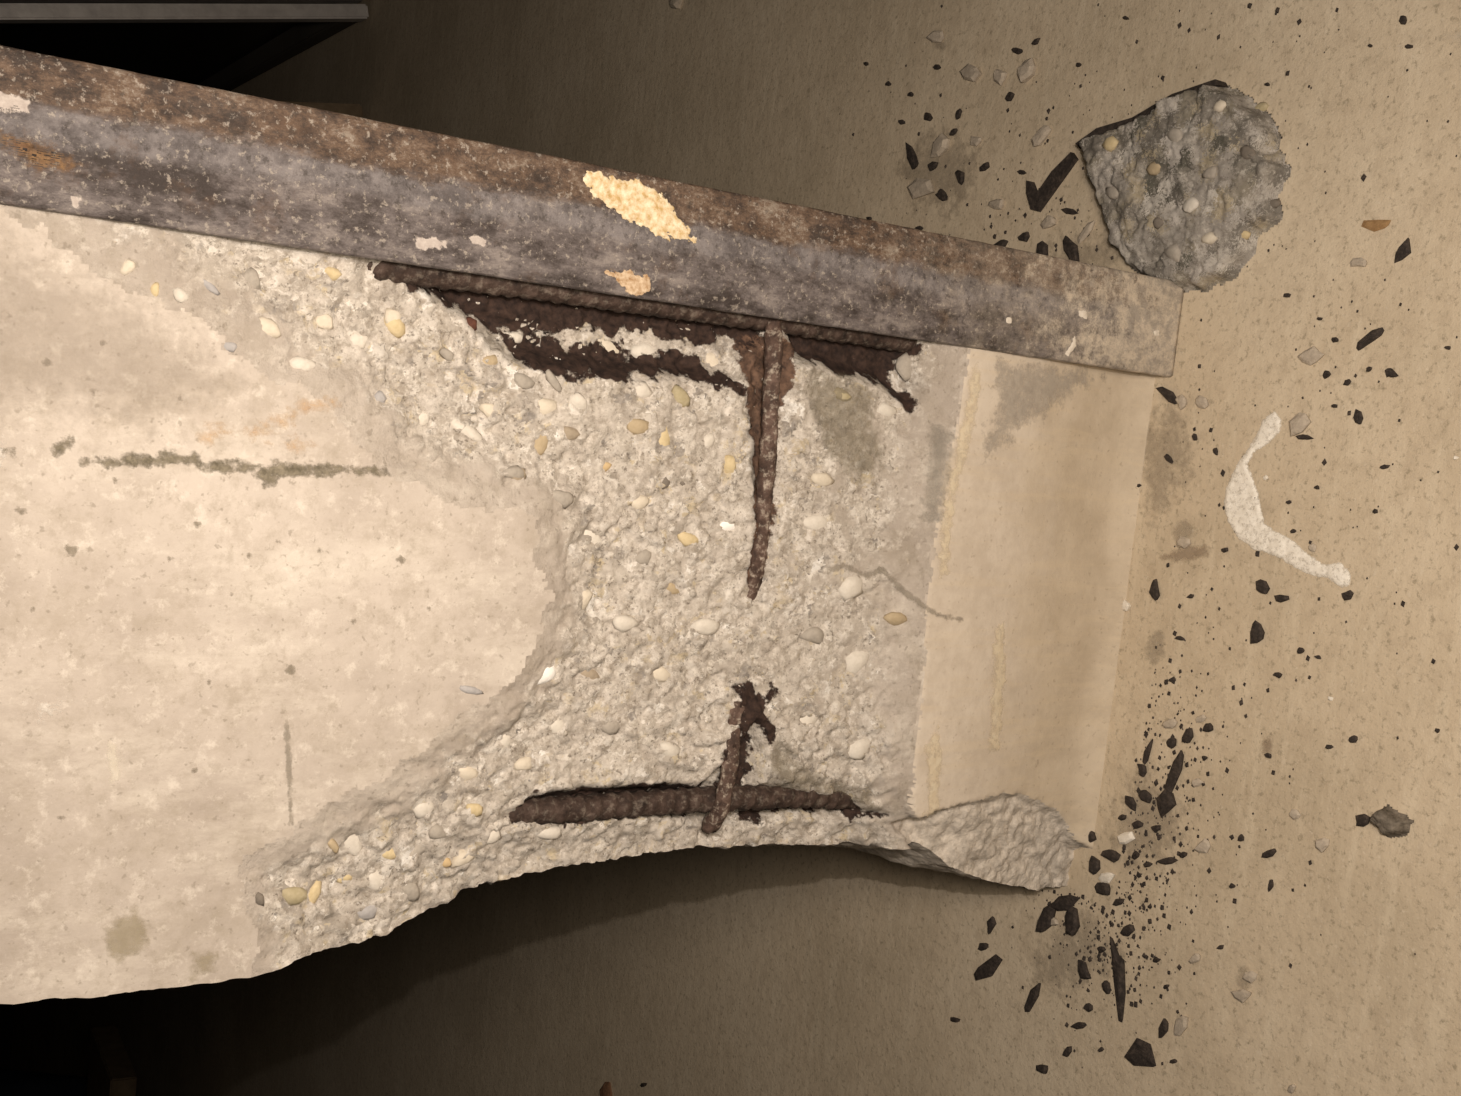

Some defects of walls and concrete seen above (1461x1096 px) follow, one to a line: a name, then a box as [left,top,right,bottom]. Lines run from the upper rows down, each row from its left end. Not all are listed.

crack [54,438,390,487]
rust [406,284,922,583]
spalling [1,205,1091,977]
rust [511,680,778,824]
rust [738,807,815,825]
rust [833,803,889,823]